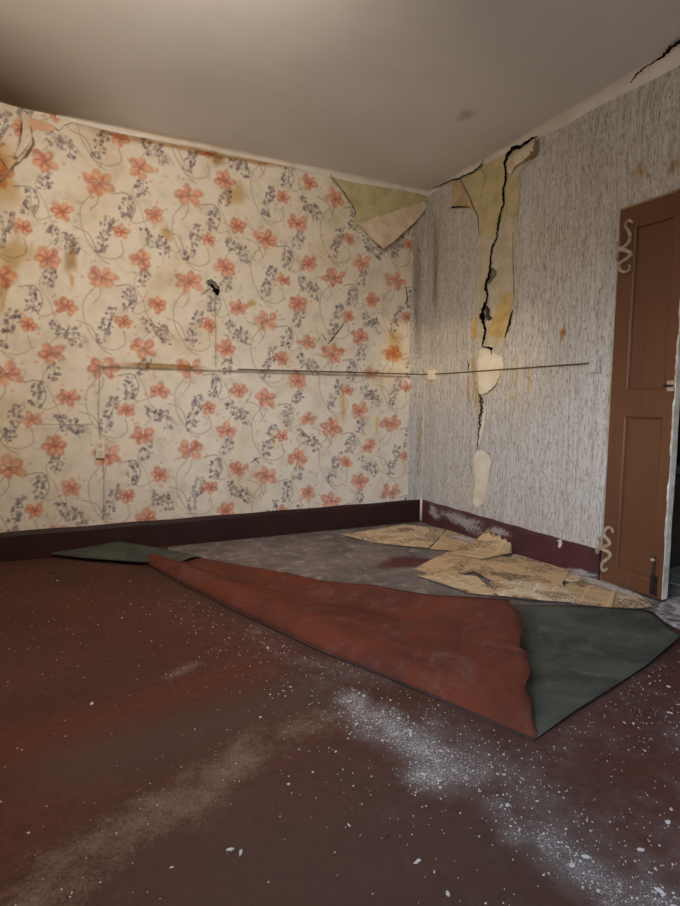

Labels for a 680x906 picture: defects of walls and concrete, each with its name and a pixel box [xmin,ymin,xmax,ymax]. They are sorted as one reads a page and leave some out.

crack [630,40,680,83]
flaking render [451,155,519,238]
crack [432,136,537,353]
flaking render [472,293,513,340]
crack [477,393,486,450]